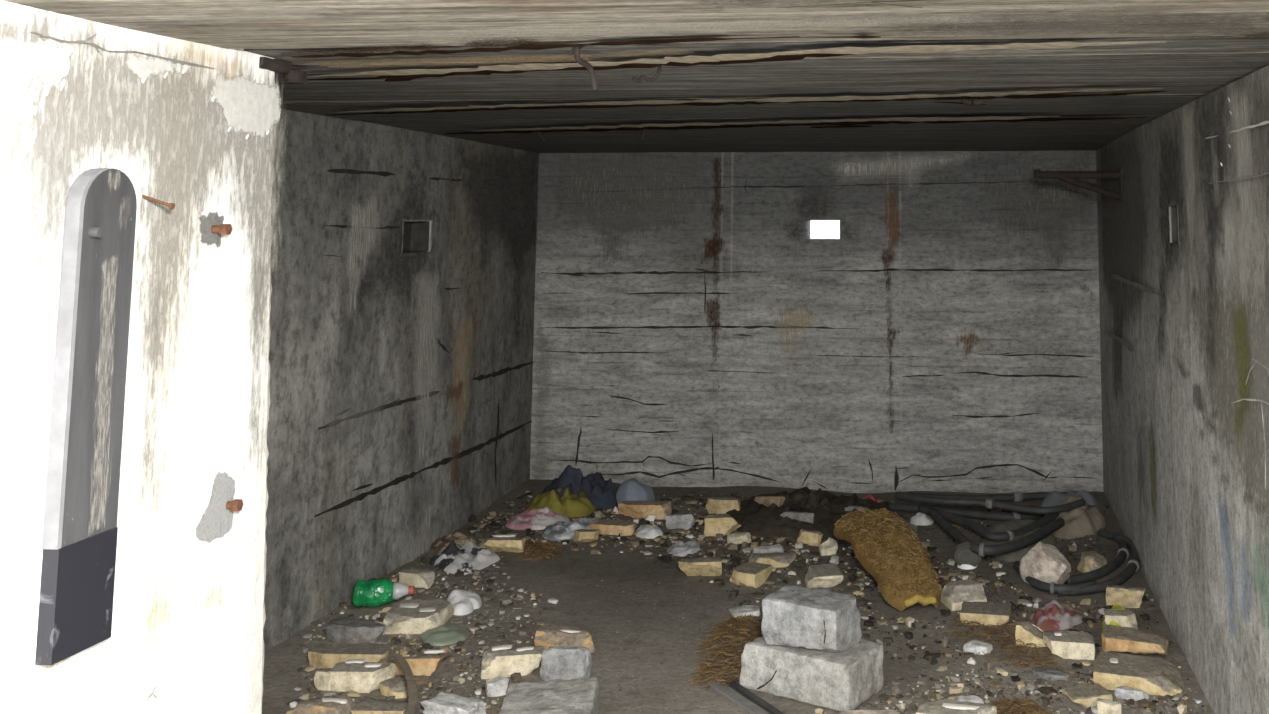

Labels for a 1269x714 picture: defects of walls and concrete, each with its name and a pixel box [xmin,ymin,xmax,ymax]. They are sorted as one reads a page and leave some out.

damp [0,13,57,43]
peeling [0,37,76,131]
peeling [211,73,281,140]
damp [2,26,283,374]
rust [701,159,723,355]
rust [882,172,900,286]
damp [88,257,117,535]
crack [314,268,1097,518]
spalling [189,471,235,555]